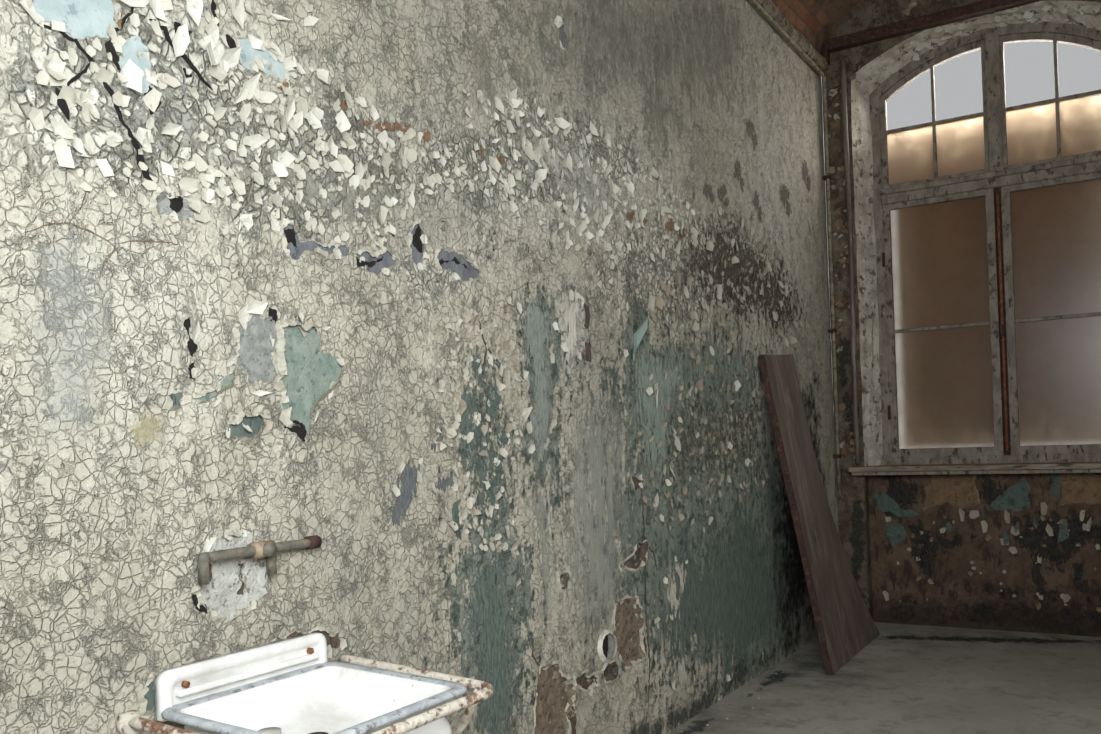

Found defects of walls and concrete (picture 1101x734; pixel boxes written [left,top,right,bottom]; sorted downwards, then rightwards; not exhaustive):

peeling [554,15,569,51]
crack [27,193,177,280]
peeling [462,87,711,262]
damp [648,159,815,354]
peeling [165,300,345,449]
damp [801,377,825,486]
damp [836,340,852,426]
peeling [390,290,780,734]
damp [631,472,813,734]
damp [850,487,864,588]
damp [879,475,977,577]
damp [938,507,1101,636]